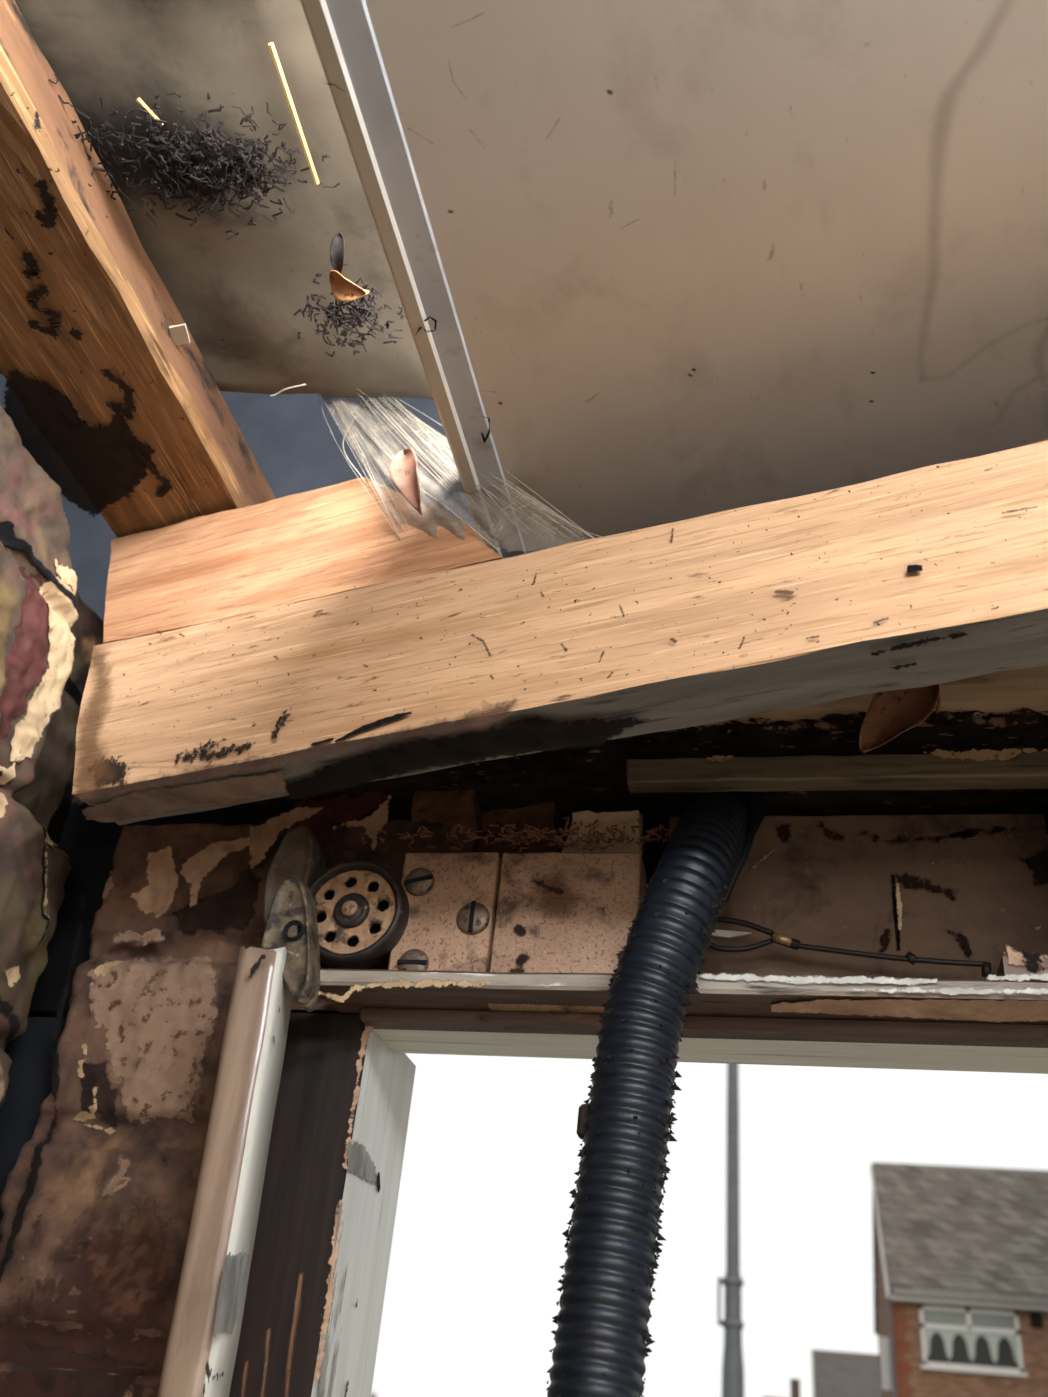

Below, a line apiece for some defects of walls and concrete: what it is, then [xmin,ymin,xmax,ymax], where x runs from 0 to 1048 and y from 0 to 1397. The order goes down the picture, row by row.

peeling [0,558,78,818]
water stain [77,643,648,823]
peeling [923,748,1048,762]
peeling [5,965,20,987]
peeling [73,791,393,1135]
peeling [318,978,485,1003]
spalling [102,1157,131,1197]
spalling [87,1199,169,1321]
peeling [213,1252,249,1338]
spalling [201,1361,224,1397]